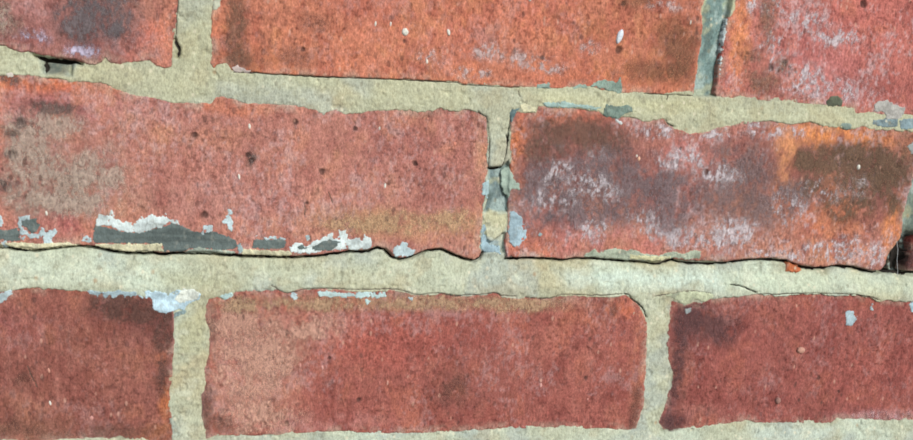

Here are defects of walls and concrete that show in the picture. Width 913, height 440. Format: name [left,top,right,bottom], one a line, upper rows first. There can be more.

peeling [500,166,520,198]
water stain [516,116,913,249]
peeling [0,209,372,256]
peeling [480,210,527,255]
crack [8,245,481,260]
peeling [393,242,416,257]
water stain [756,239,881,265]
crack [506,257,913,300]
crack [271,285,699,317]